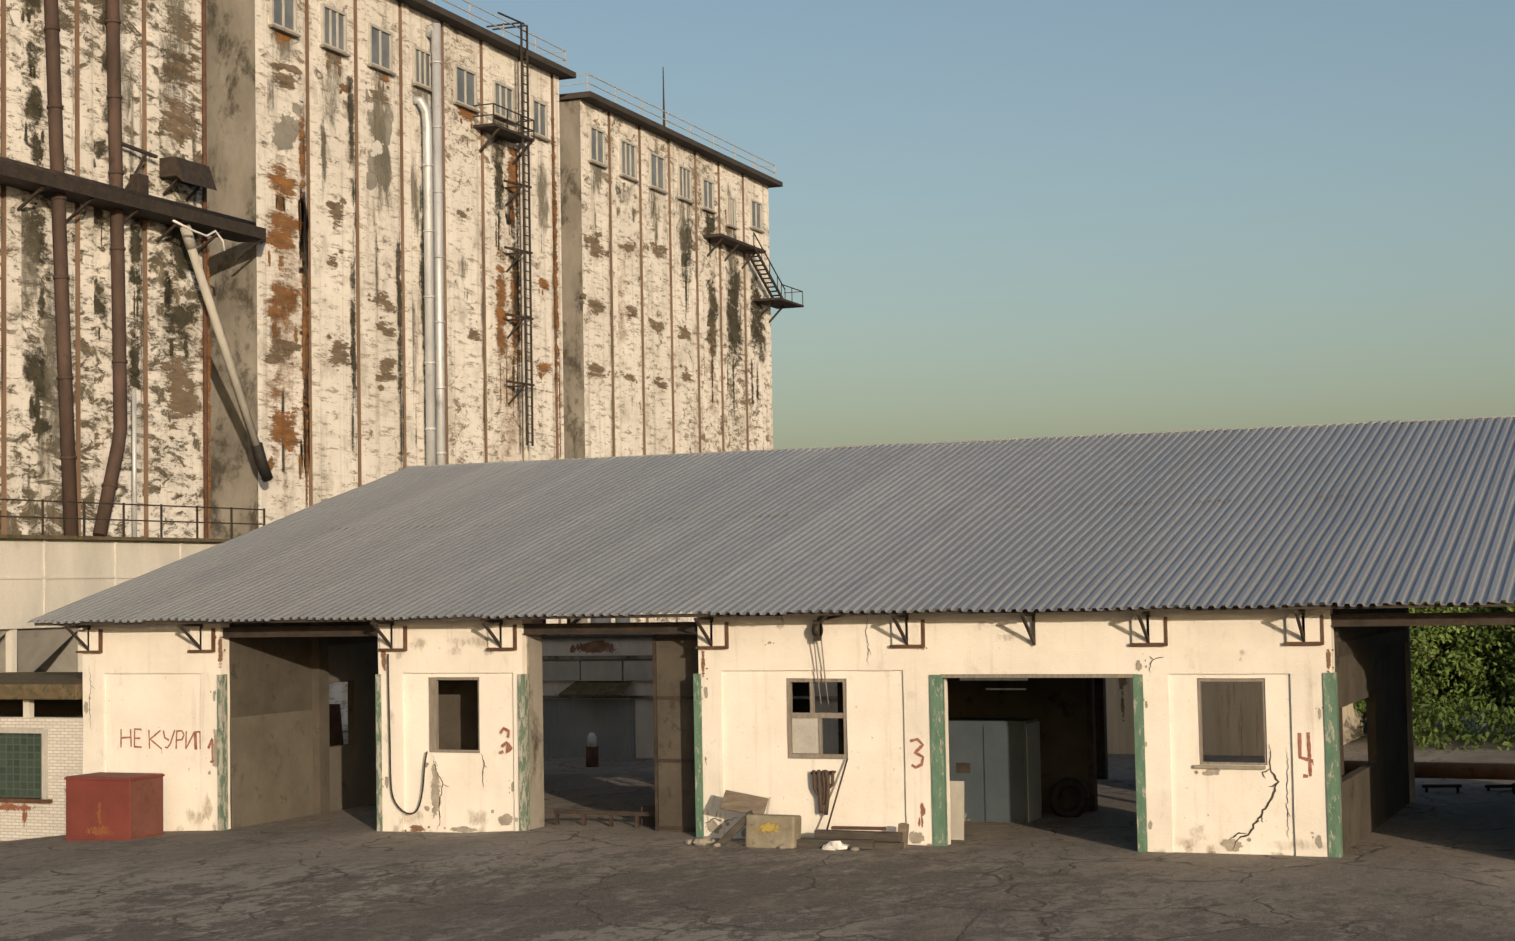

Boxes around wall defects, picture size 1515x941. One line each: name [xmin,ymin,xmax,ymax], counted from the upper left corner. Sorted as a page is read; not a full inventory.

leakage [21,203,60,535]
leakage [128,217,143,421]
leakage [164,226,201,358]
corrosion [264,102,309,505]
leakage [321,50,356,229]
leakage [374,70,391,206]
leakage [396,167,426,460]
corrosion [495,117,561,457]
leakage [593,164,602,192]
leakage [617,187,658,251]
leakage [677,192,767,417]
crack [1230,746,1290,850]